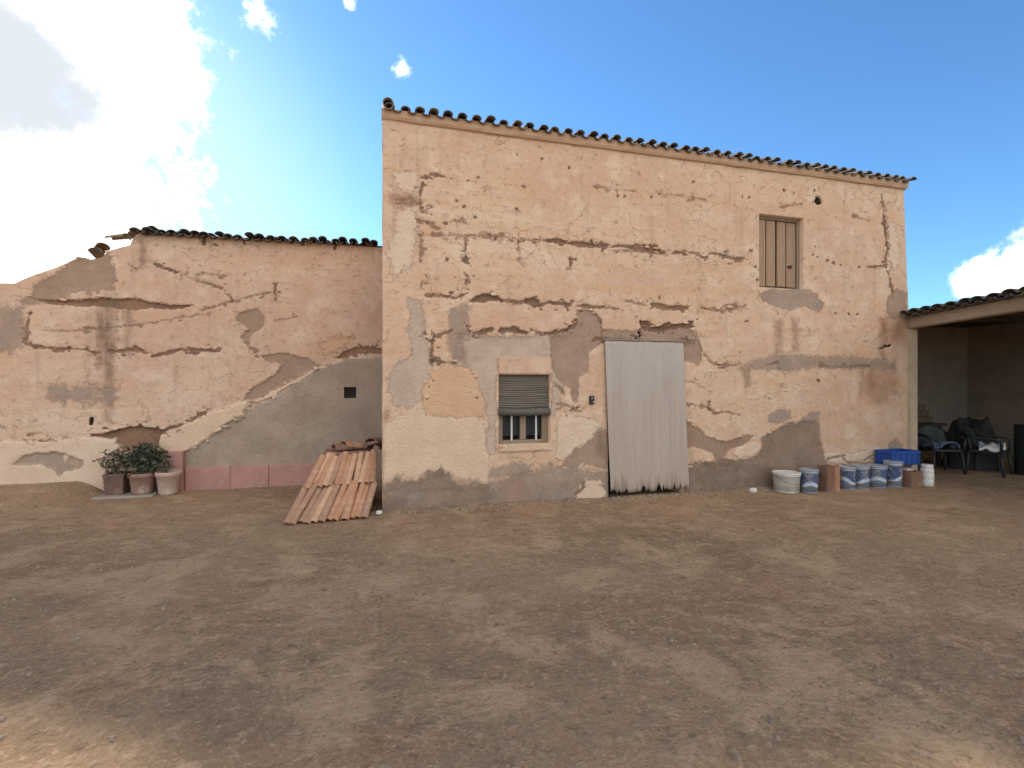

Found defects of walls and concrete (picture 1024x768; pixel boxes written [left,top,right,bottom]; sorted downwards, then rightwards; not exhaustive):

spalling [32,295,194,311]
flaking render [236,308,382,401]
flaking render [385,296,435,409]
flaking render [454,307,702,455]
crack [414,170,749,369]
crack [819,362,870,370]
crack [826,196,893,295]
flaking render [686,420,753,461]